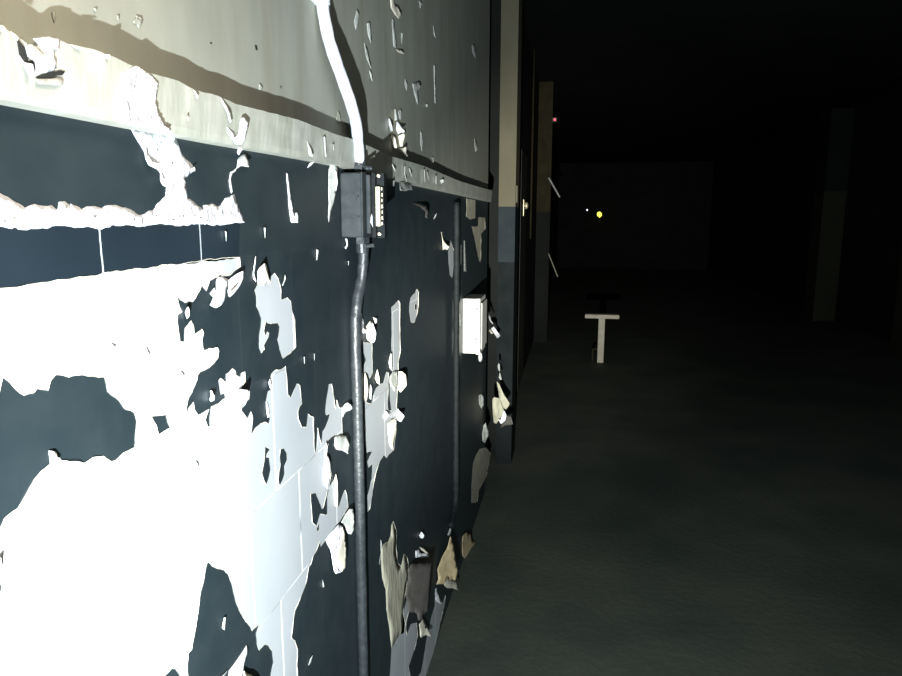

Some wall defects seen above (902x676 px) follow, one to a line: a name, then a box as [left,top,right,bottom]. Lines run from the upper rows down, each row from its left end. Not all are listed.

spalling [0,25,85,85]
peeling [354,10,372,79]
peeling [390,0,404,54]
peeling [405,65,436,107]
peeling [388,109,413,191]
peeling [0,66,354,676]
peeling [361,289,419,512]
peeling [471,363,513,503]
peeling [379,521,475,676]